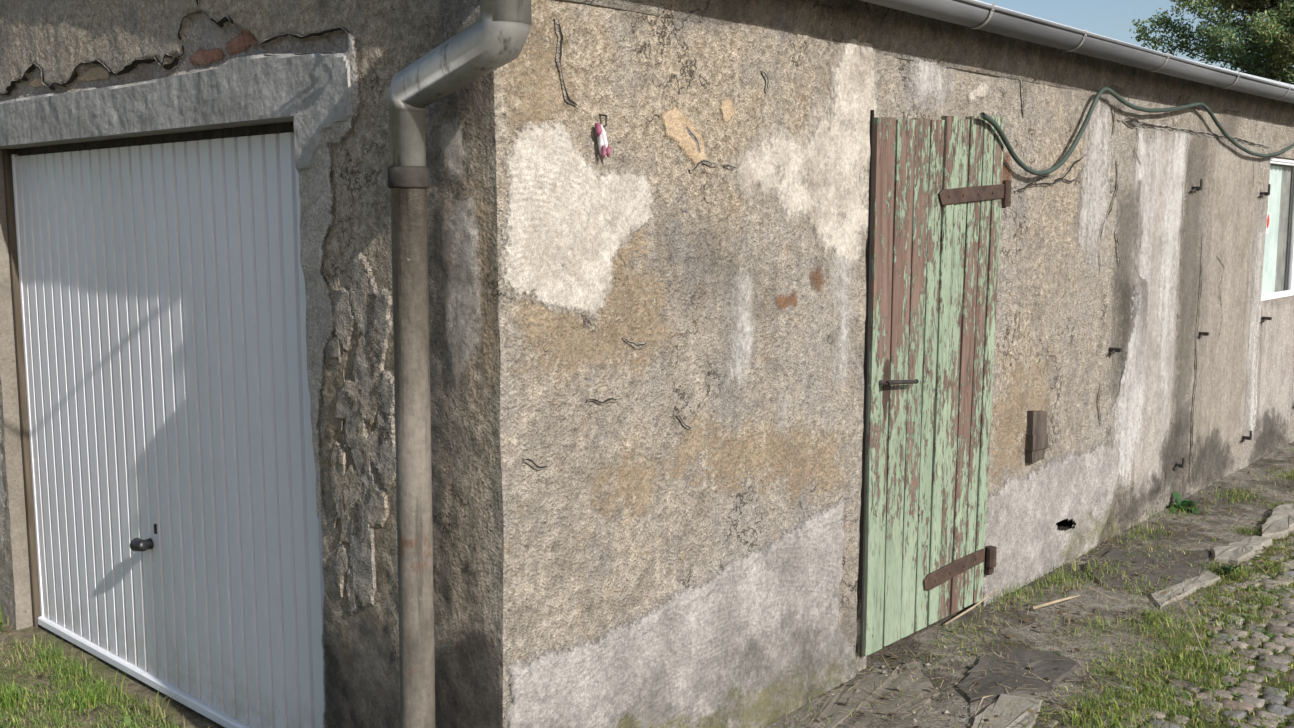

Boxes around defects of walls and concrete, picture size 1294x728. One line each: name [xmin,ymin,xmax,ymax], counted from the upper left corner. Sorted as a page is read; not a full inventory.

spalling [0,10,348,101]
peeling [662,106,707,167]
peeling [720,99,736,123]
damp [1079,85,1121,254]
damp [1099,131,1234,544]
damp [321,605,400,728]
damp [435,631,502,728]